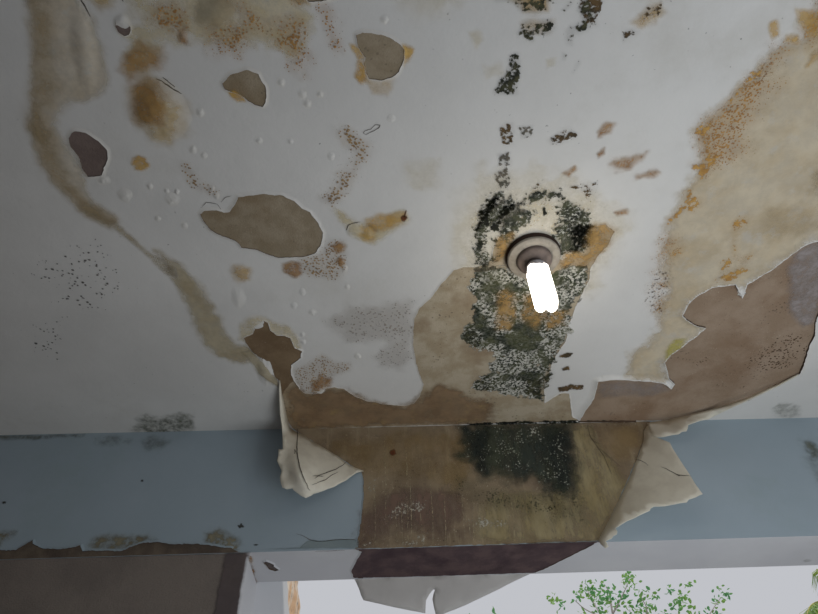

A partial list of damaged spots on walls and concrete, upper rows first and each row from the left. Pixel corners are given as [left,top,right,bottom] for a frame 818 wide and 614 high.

mould [515,0,554,40]
leakage [563,0,602,41]
peeling [219,66,270,110]
peeling [353,28,407,83]
mould [495,54,521,95]
peeling [65,127,112,179]
leakage [627,13,818,381]
peeling [196,190,327,260]
mould [461,124,609,402]
peeling [241,223,818,614]
mould [457,420,612,523]
peeling [0,538,238,559]